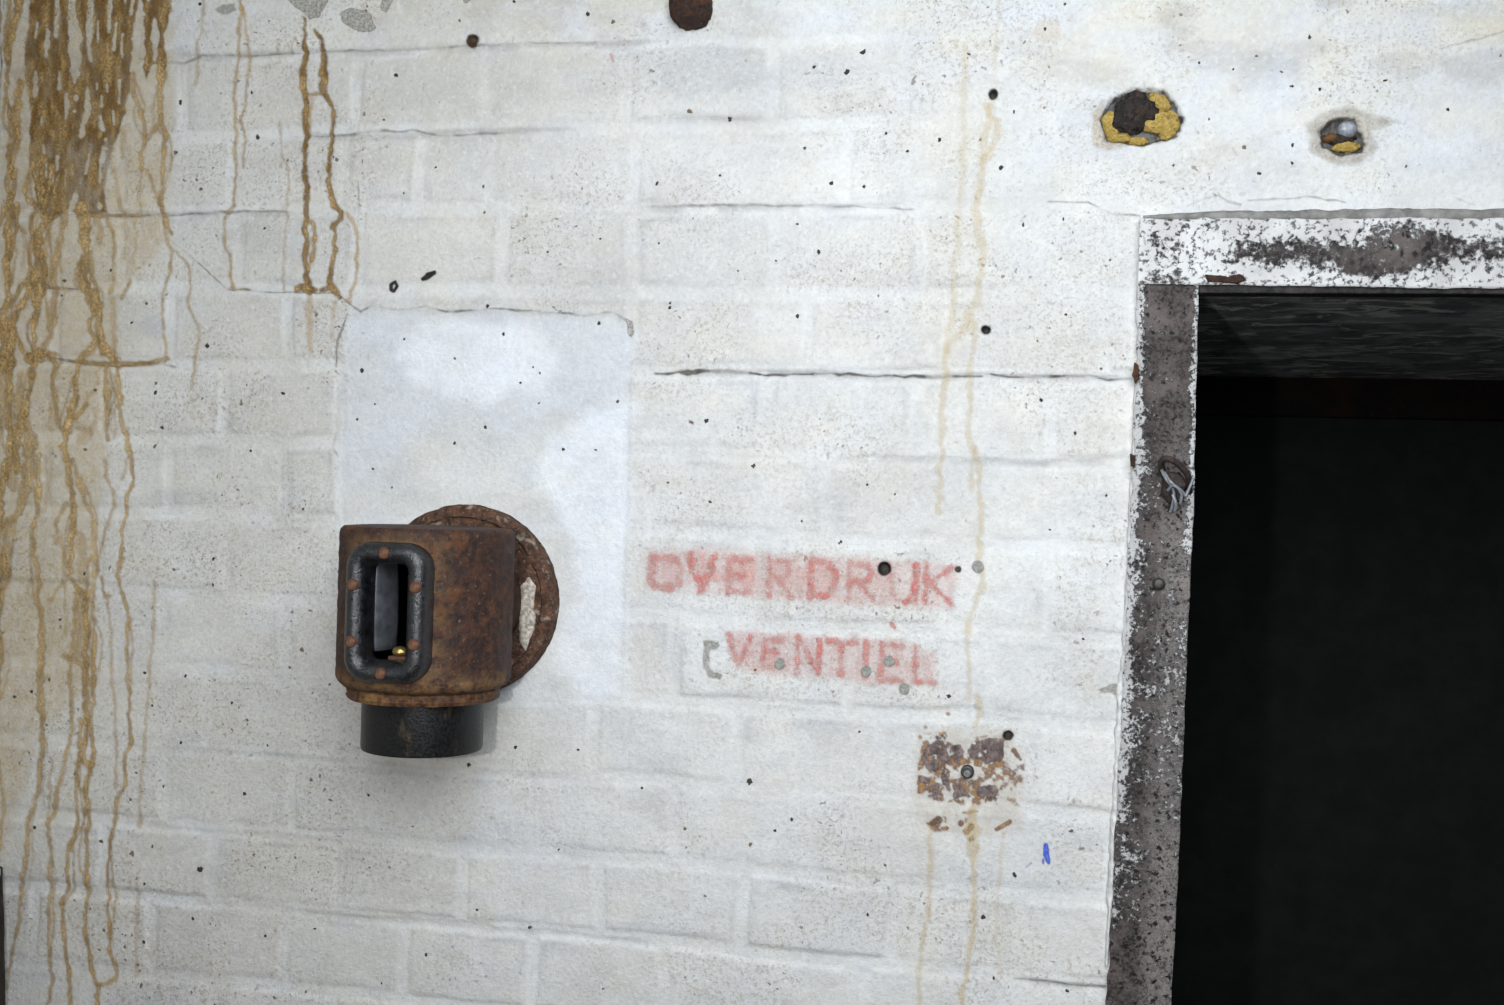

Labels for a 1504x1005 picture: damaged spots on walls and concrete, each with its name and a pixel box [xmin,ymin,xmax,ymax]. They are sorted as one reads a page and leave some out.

spalling [1094,89,1184,149]
spalling [1310,110,1389,161]
rust [917,726,1024,841]